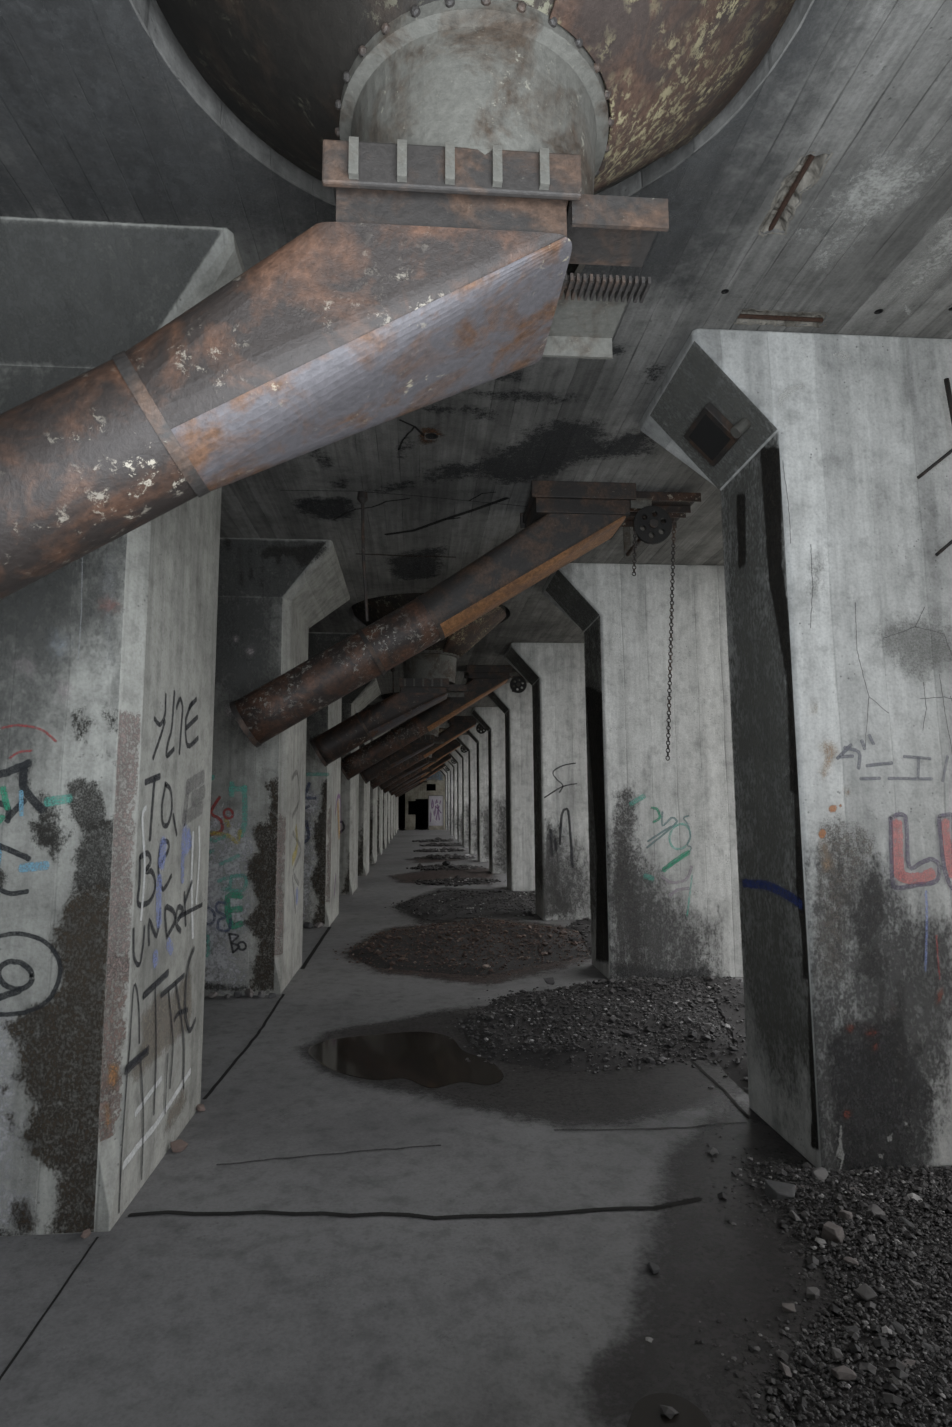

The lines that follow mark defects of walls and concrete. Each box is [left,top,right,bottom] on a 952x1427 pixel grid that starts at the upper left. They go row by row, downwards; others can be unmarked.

leakage [30,817,54,848]
leakage [67,778,106,833]
leakage [294,447,952,1427]